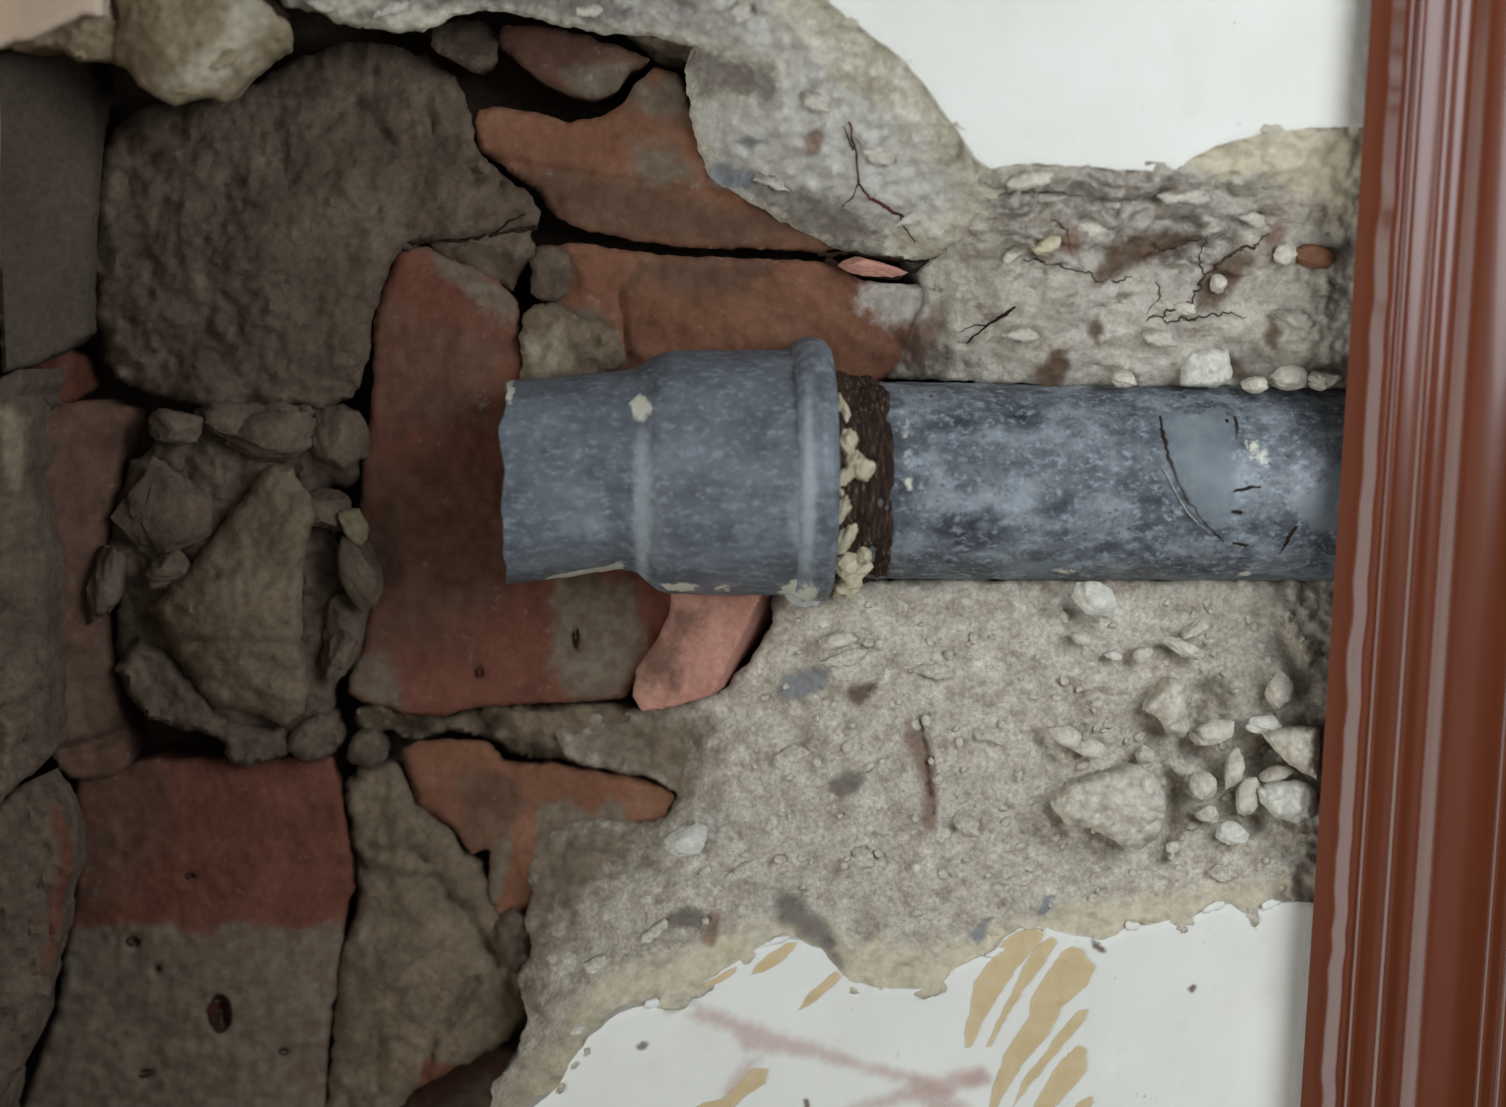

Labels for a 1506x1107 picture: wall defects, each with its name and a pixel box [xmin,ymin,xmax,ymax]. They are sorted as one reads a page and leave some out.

crack [110,0,121,21]
crack [267,0,289,20]
spalling [9,0,1363,389]
spalling [149,464,316,728]
spalling [490,578,1334,1107]
spalling [207,994,232,1034]